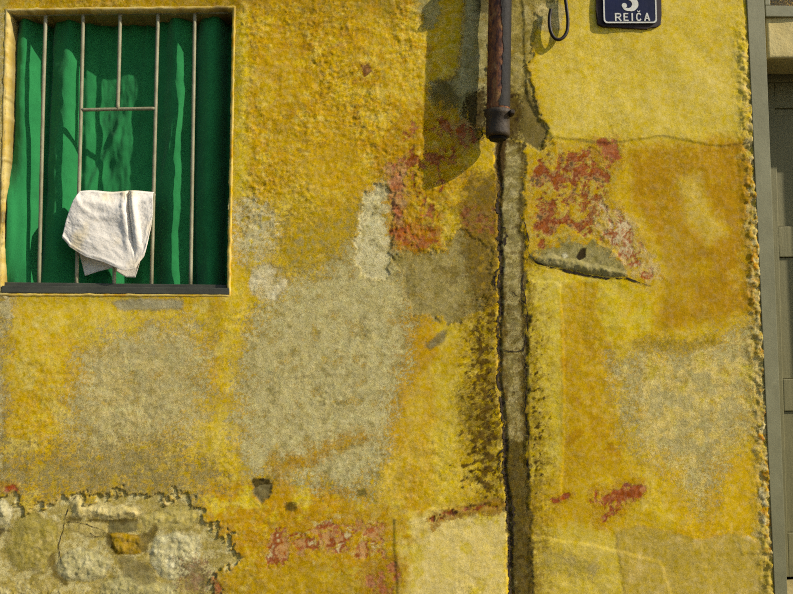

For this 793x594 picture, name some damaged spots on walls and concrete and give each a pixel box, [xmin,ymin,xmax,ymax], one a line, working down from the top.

damp [432,79,487,141]
peeling [509,0,665,293]
flaking render [0,0,505,594]
damp [459,294,545,594]
crack [489,144,650,594]